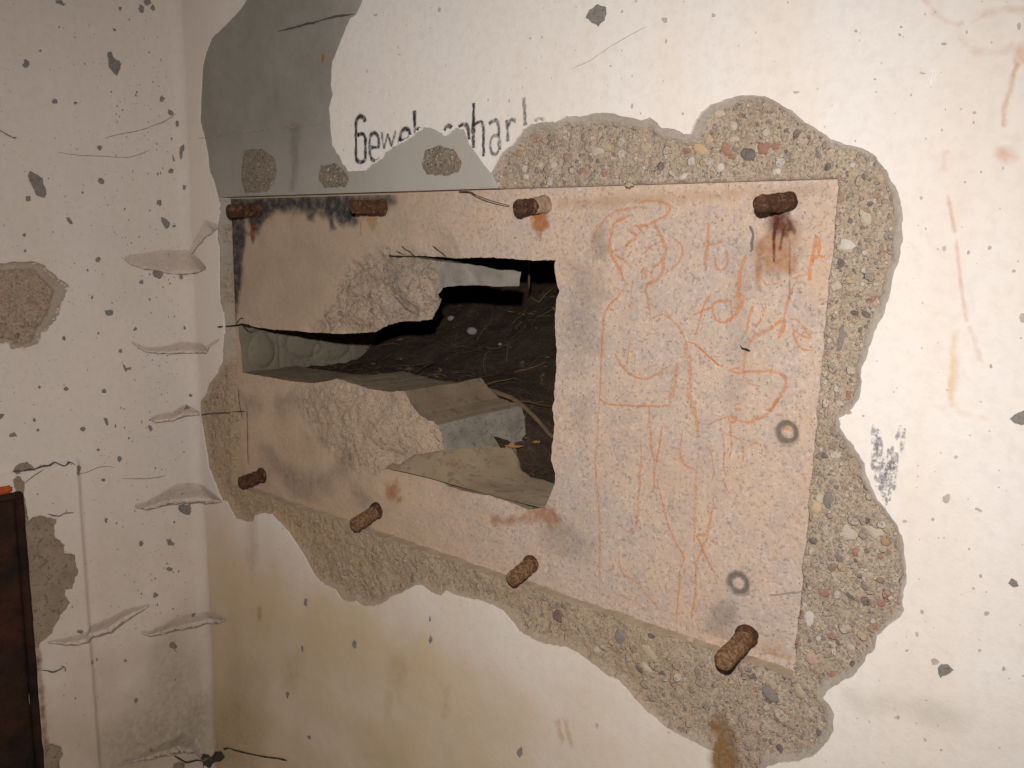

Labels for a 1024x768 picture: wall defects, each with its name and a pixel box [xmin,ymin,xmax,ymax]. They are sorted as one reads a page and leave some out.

spalling [0,233,69,349]
corrosion [534,214,548,231]
corrosion [764,212,794,267]
spalling [184,0,907,768]
peeling [13,462,78,649]
corrosion [712,722,736,768]